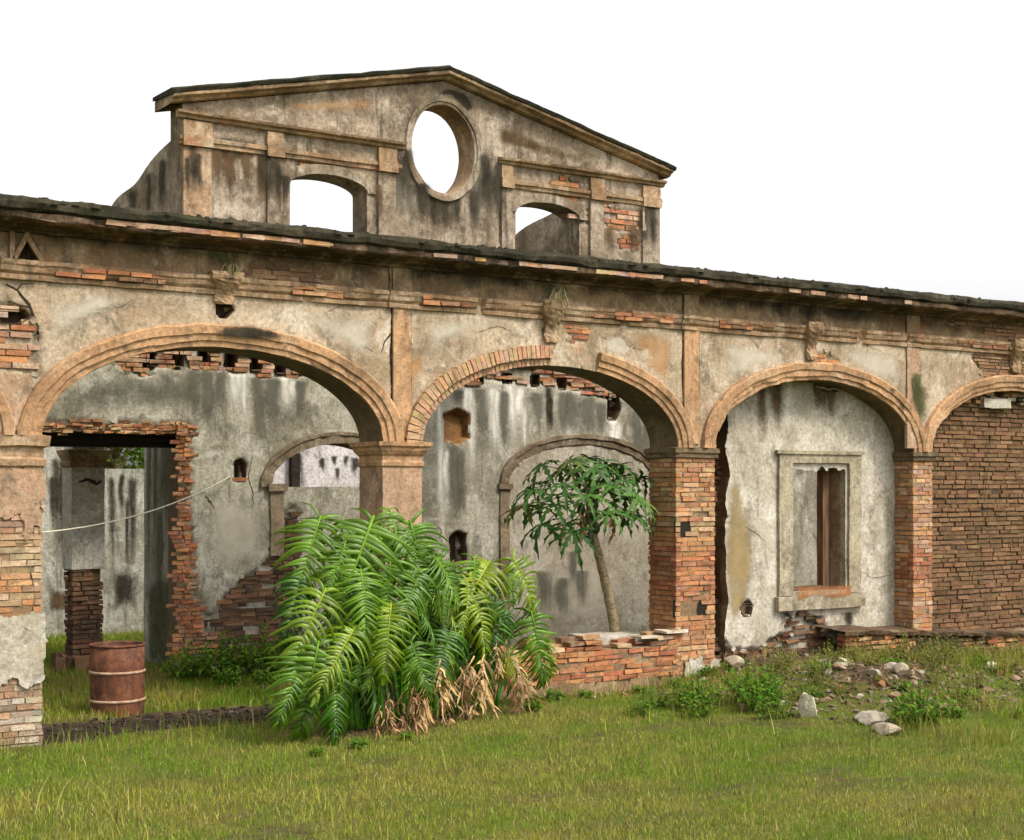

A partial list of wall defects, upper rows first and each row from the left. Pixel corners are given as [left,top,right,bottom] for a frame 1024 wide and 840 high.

leakage [185,138,290,197]
spalling [604,201,643,252]
crack [6,283,40,341]
spalling [110,351,299,379]
spalling [465,369,616,401]
leakage [758,384,782,424]
spalling [947,321,1024,377]
leakage [437,386,621,513]
leakage [109,448,168,583]
spalling [42,419,303,671]
spalling [696,414,845,663]
leakage [115,573,134,606]